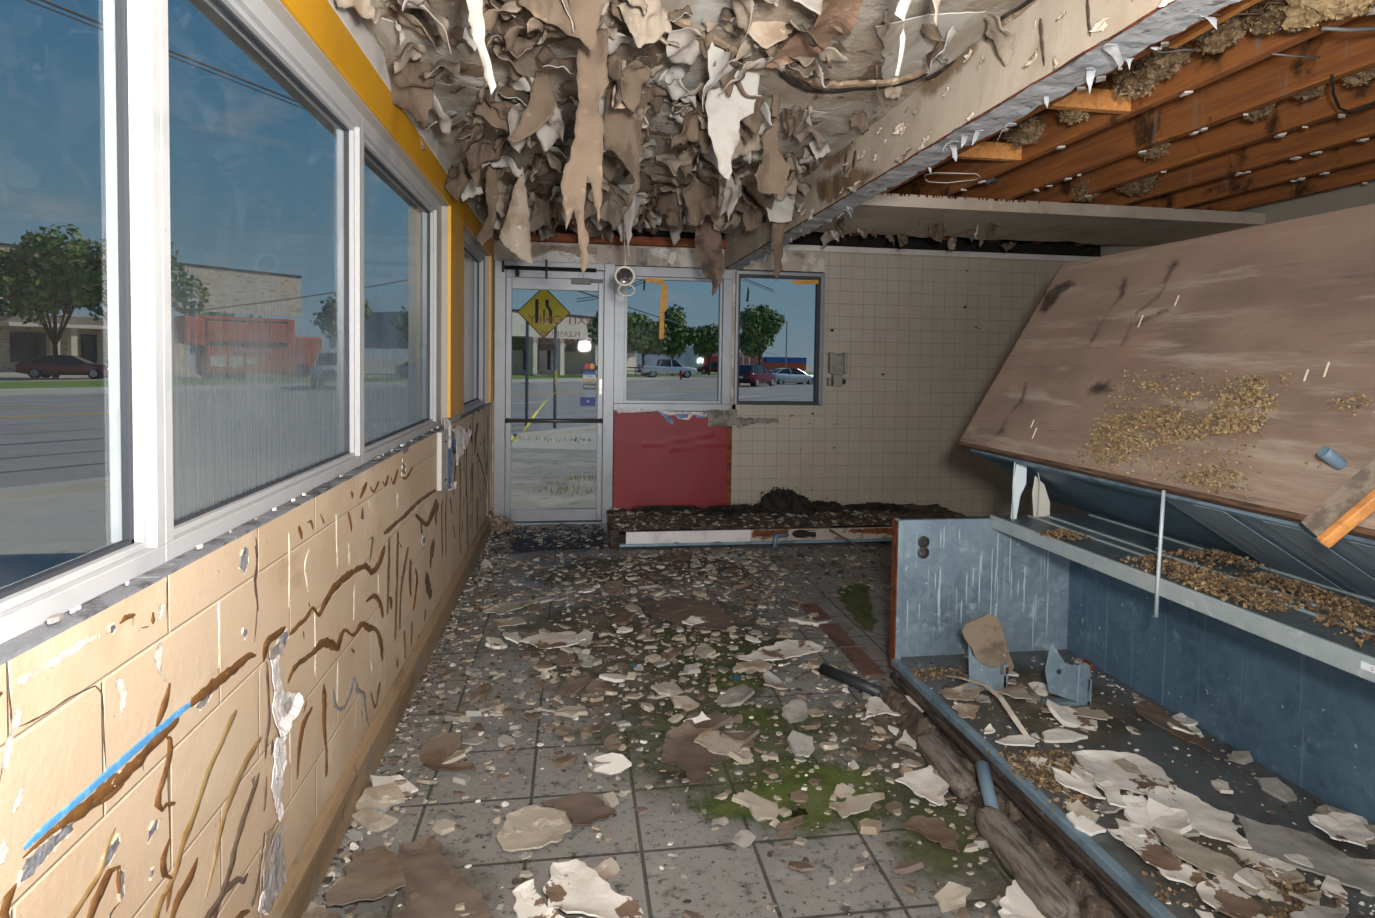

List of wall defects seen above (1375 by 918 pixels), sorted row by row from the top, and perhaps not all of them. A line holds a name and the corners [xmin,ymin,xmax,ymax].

peeling [1086,67,1096,94]
peeling [1088,17,1134,70]
crack [163,582,171,619]
crack [252,537,260,643]
crack [0,666,106,780]
crack [164,743,172,838]
peeling [251,629,304,916]
spalling [0,822,75,887]